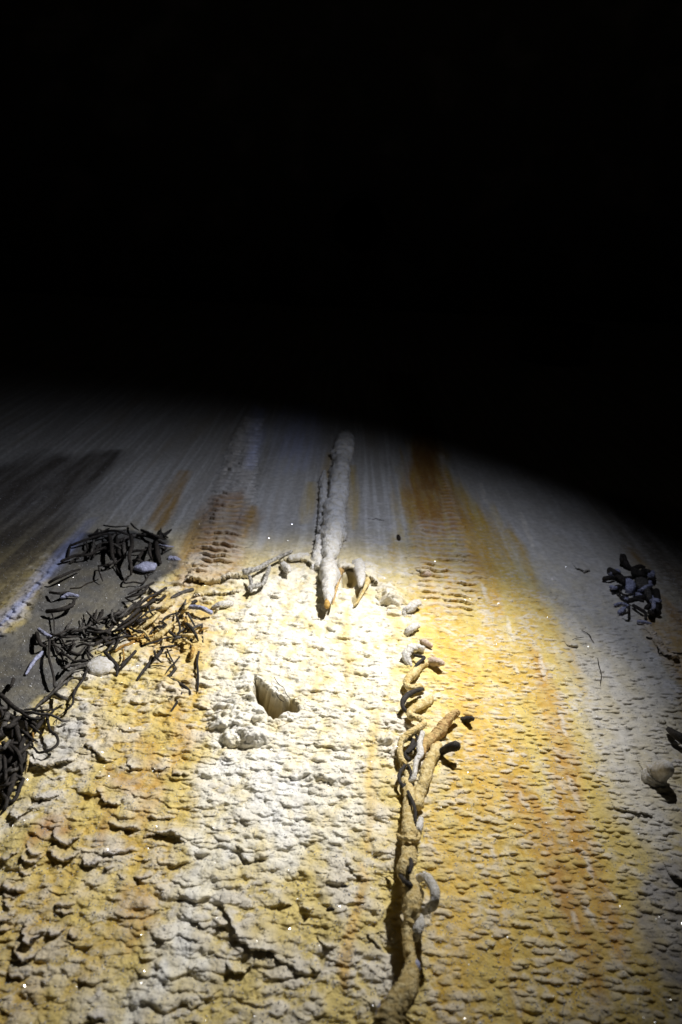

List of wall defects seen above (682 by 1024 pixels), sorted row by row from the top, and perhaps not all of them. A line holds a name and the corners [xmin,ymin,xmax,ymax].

rust [0,494,240,1024]
rust [145,469,194,533]
efflorescence [80,401,414,1024]
rust [311,645,325,696]
rust [335,416,682,1024]